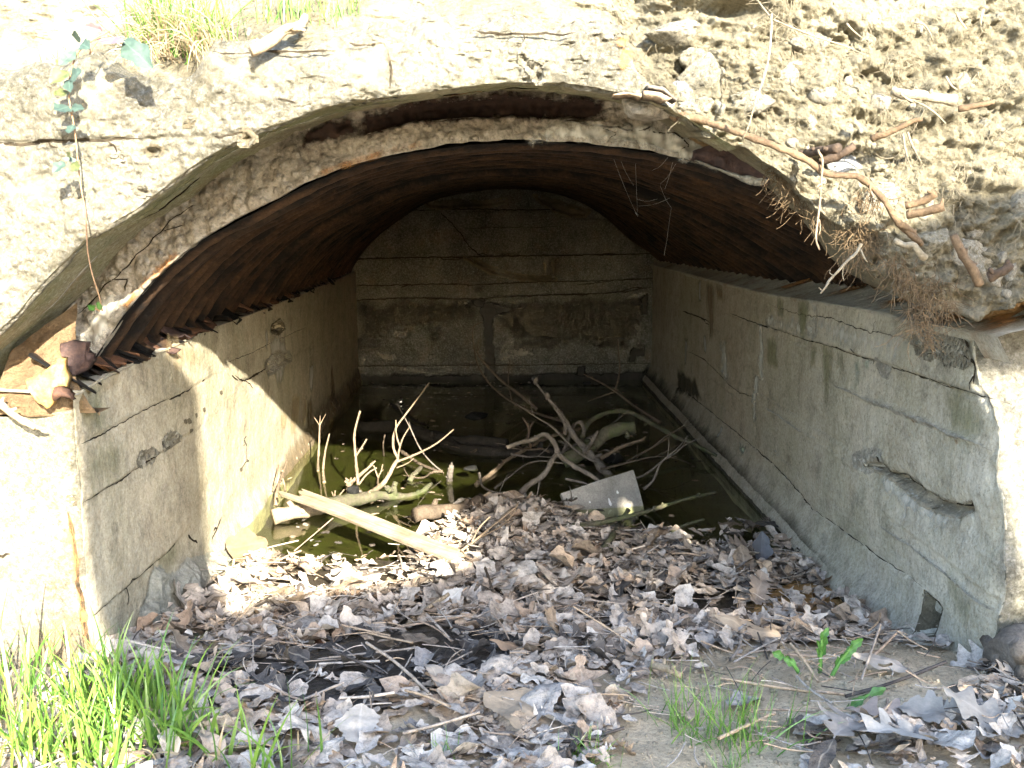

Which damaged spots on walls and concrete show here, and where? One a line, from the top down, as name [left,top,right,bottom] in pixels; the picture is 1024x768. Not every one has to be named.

crack [0,137,140,153]
rust [28,353,51,368]
rust [72,277,335,394]
crack [732,305,1009,404]
rust [984,309,1024,327]
crack [81,379,205,444]
crack [684,391,921,586]
spalling [862,460,975,519]
crack [67,446,222,647]
spalling [913,590,943,642]